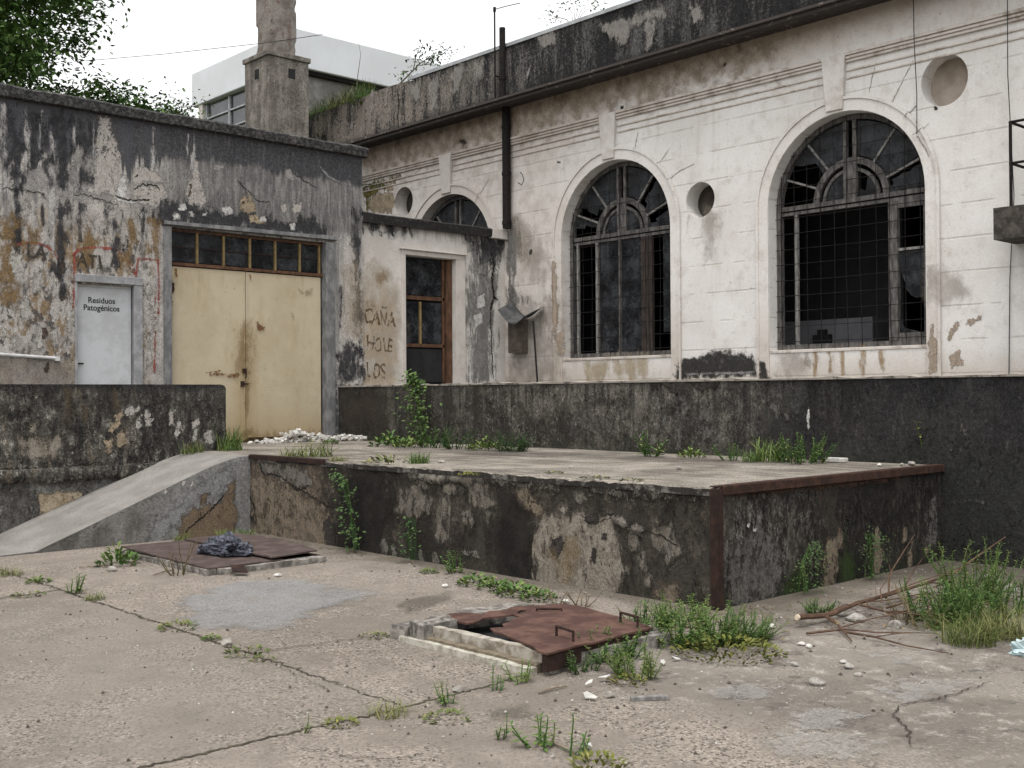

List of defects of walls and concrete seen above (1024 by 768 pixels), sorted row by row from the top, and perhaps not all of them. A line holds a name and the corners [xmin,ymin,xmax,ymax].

damp [538,31,556,48]
damp [0,103,97,308]
damp [103,198,327,267]
damp [335,70,680,435]
damp [675,349,769,380]
peeling [927,315,982,374]
spalling [103,405,154,455]
peeling [169,409,214,444]
spalling [147,462,336,546]
crack [260,464,334,508]
spalling [512,488,686,603]
crack [791,681,990,745]